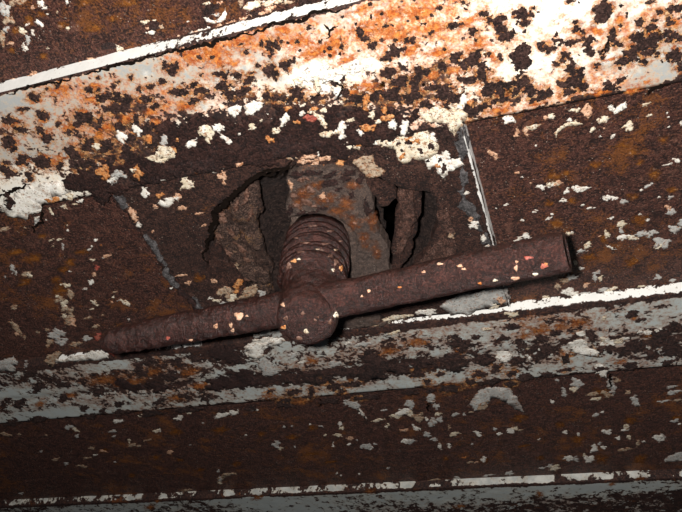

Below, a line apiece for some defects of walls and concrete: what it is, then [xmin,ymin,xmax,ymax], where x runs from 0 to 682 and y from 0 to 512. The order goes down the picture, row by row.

peeling [0,0,58,52]
peeling [191,0,317,33]
spalling [0,59,479,229]
corrosion [0,0,682,185]
peeling [554,102,627,138]
crack [201,160,296,262]
corrosion [284,168,382,259]
corrosion [261,378,369,404]
spalling [78,285,682,437]
spalling [318,384,462,450]
corrosion [407,363,518,394]
corrosion [556,350,575,374]